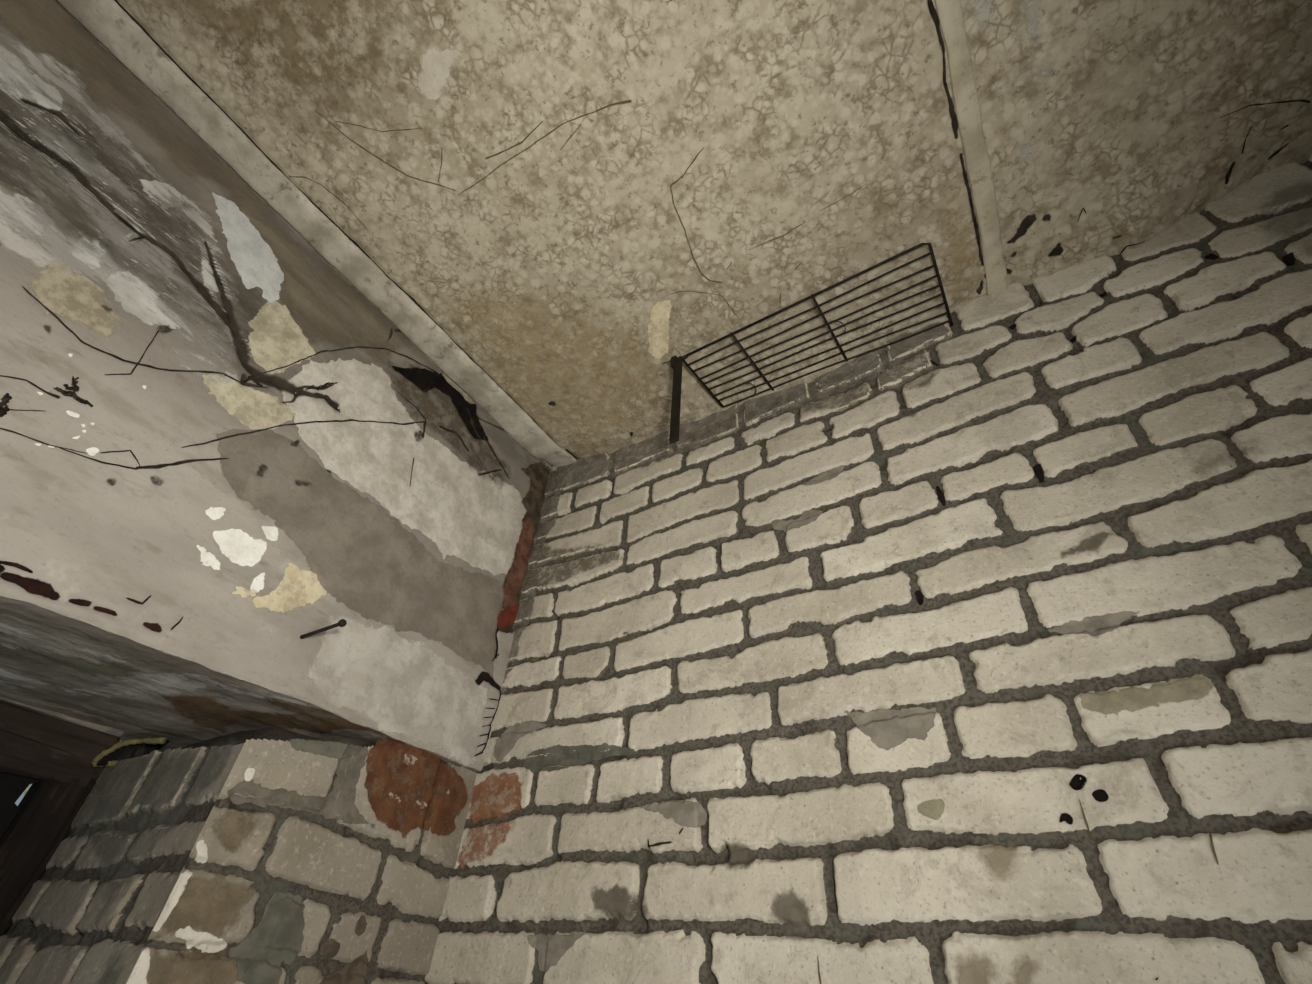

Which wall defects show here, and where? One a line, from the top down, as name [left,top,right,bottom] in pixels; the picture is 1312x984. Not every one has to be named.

flaking render [0,34,551,678]
crack [0,0,579,486]
crack [316,100,631,196]
crack [927,0,984,266]
damp [0,622,307,706]
corrosion [162,695,522,869]